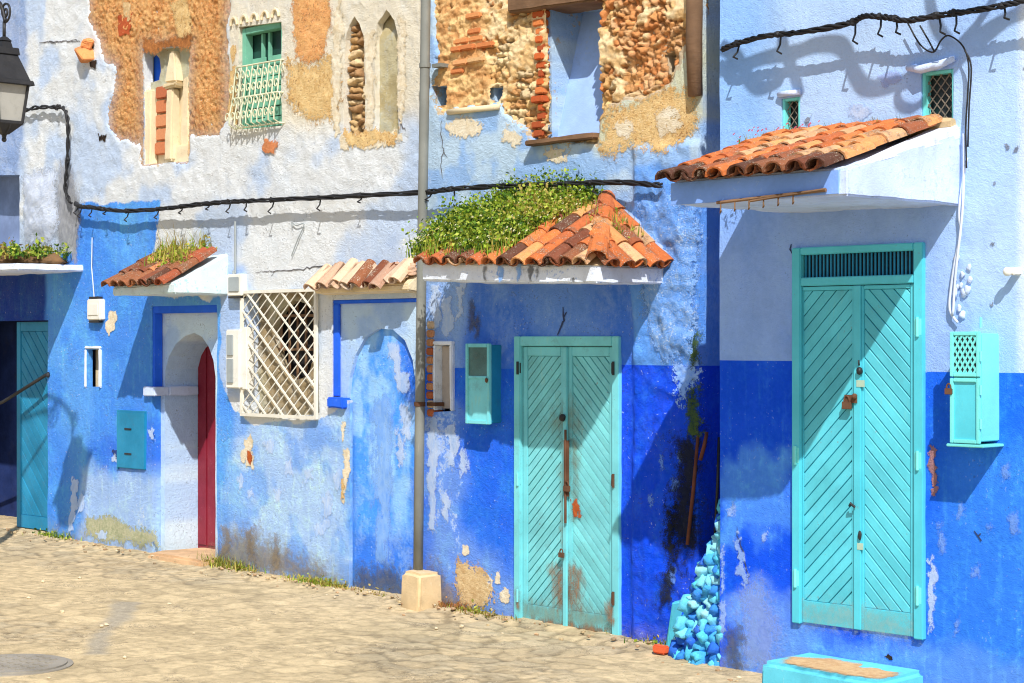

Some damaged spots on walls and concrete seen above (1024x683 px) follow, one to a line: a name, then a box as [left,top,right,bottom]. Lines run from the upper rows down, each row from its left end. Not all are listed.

flaking render [74,0,238,166]
flaking render [431,0,700,164]
peeling [236,434,275,499]
damp [214,527,335,579]
peeling [313,421,351,537]
peeling [426,413,470,530]
peeling [452,544,510,609]
rust [550,565,582,610]
rust [570,499,582,518]
damp [652,422,712,610]